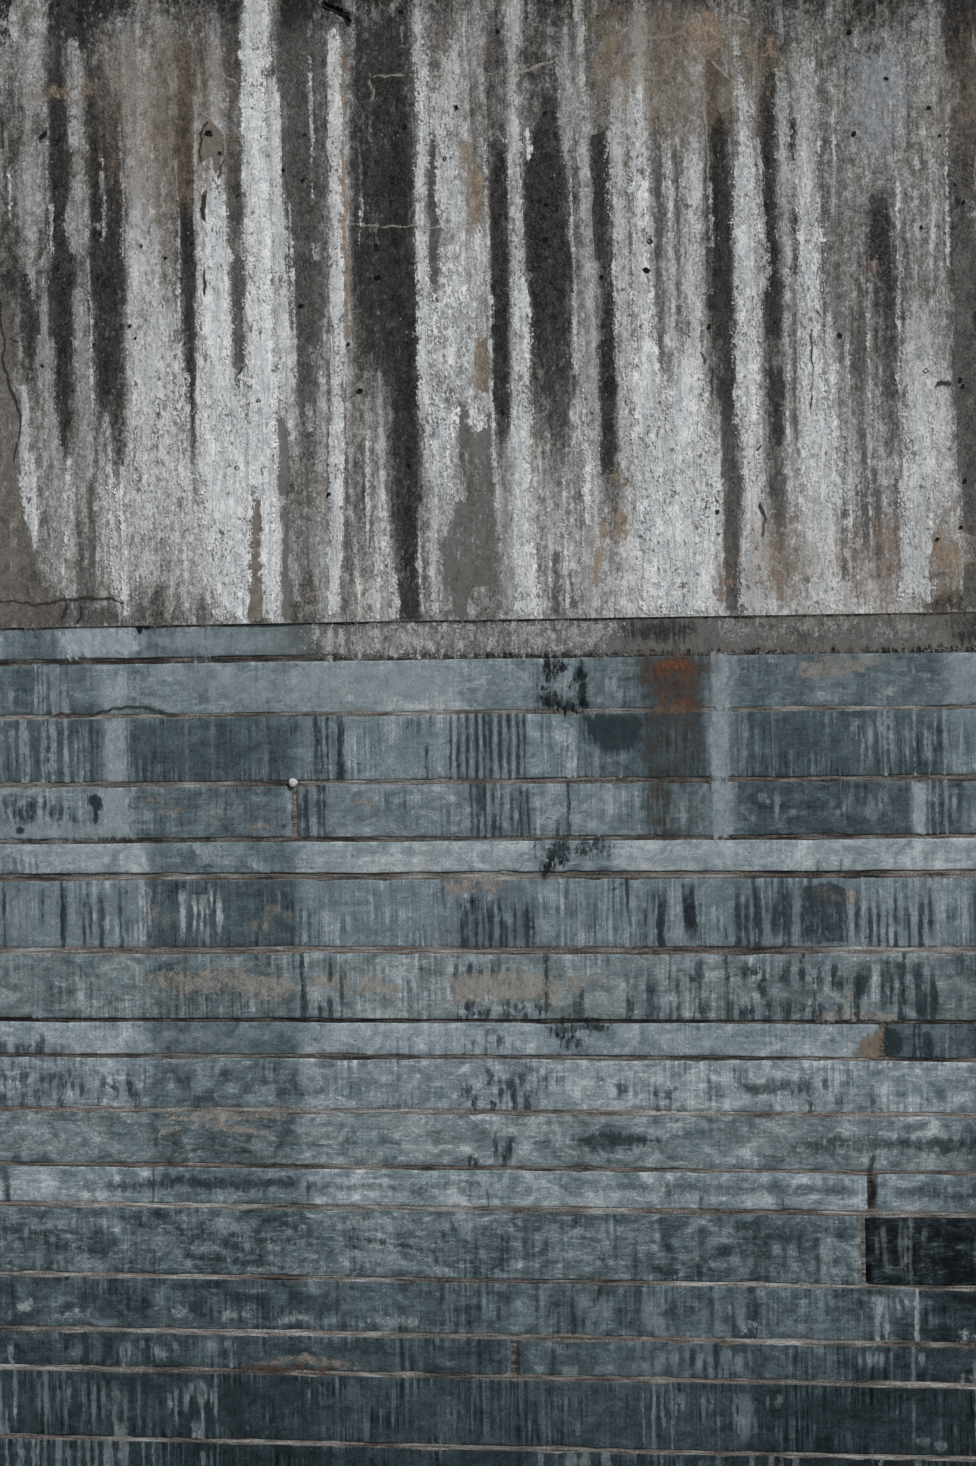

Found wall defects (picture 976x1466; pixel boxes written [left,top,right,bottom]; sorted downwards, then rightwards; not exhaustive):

leakage [0,0,401,622]
leakage [401,0,976,617]
corrosion [640,653,711,714]